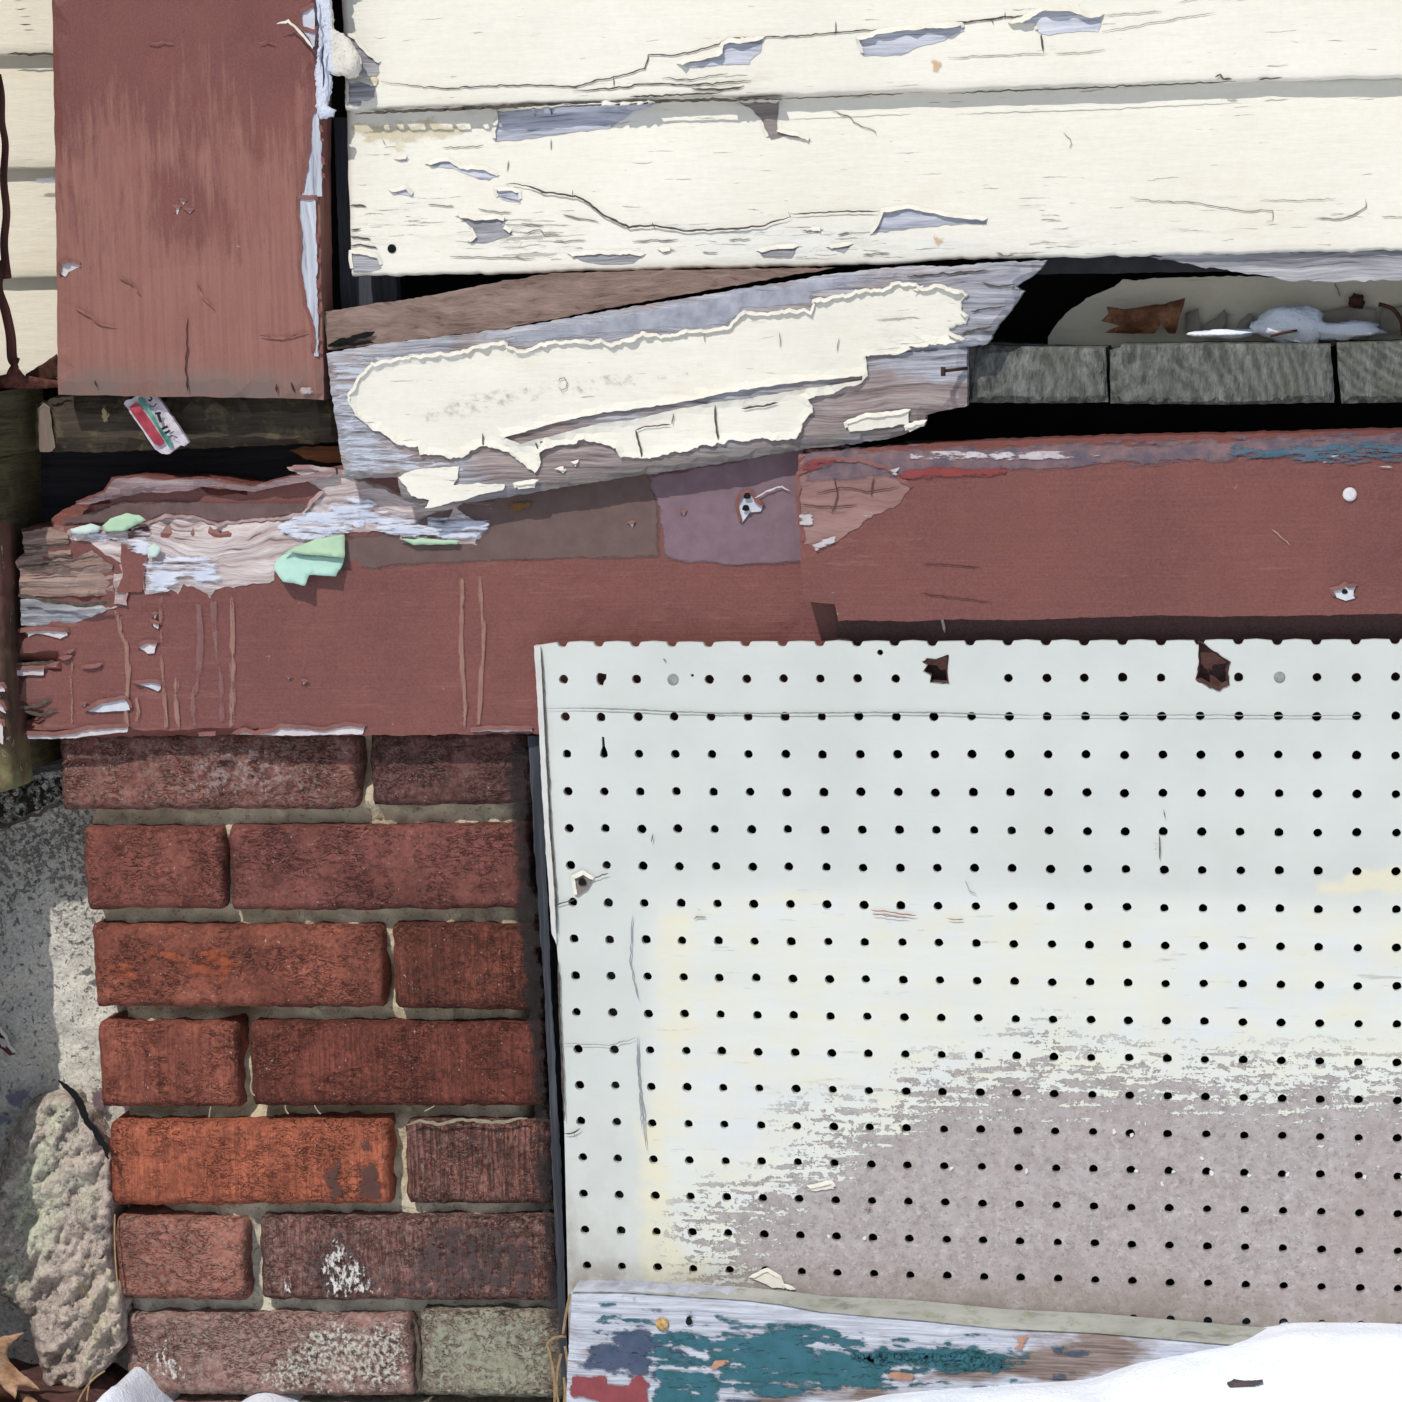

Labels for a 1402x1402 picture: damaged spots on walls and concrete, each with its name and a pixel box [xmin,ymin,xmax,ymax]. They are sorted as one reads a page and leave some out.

crack [381,23,877,97]
peeling [855,22,965,56]
crack [948,0,1210,58]
peeling [492,100,655,142]
peeling [296,107,325,356]
crack [1131,197,1396,222]
peeling [70,513,146,534]
peeling [795,451,1069,551]
peeling [274,535,345,586]
peeling [23,679,163,739]
peeling [198,722,367,736]
peeling [570,1297,1031,1402]